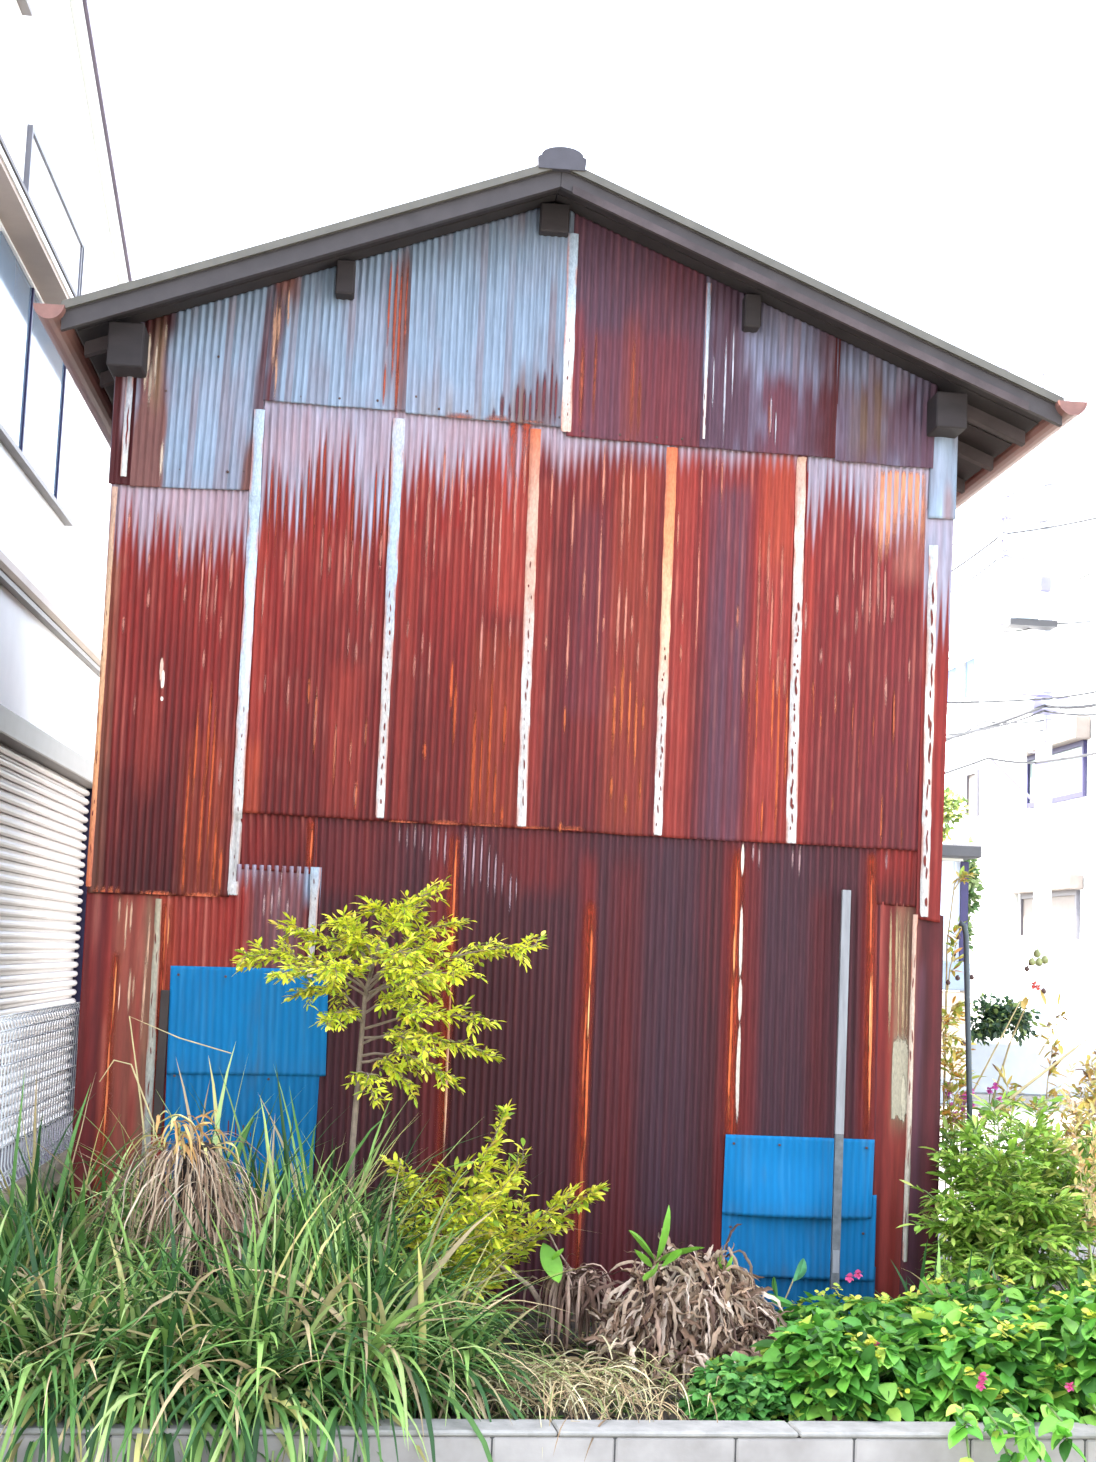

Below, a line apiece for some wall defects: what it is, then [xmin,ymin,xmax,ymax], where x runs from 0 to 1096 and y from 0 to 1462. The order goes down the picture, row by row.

rust [580,341,597,412]
rust [268,441,392,564]
rust [877,471,924,549]
rust [308,681,318,749]
rust [450,663,507,827]
rust [612,665,645,763]
rust [746,676,788,834]
rust [100,954,120,1174]
rust [435,821,459,1194]
rust [576,904,595,1264]
rust [726,852,743,1135]
rust [863,855,875,1125]